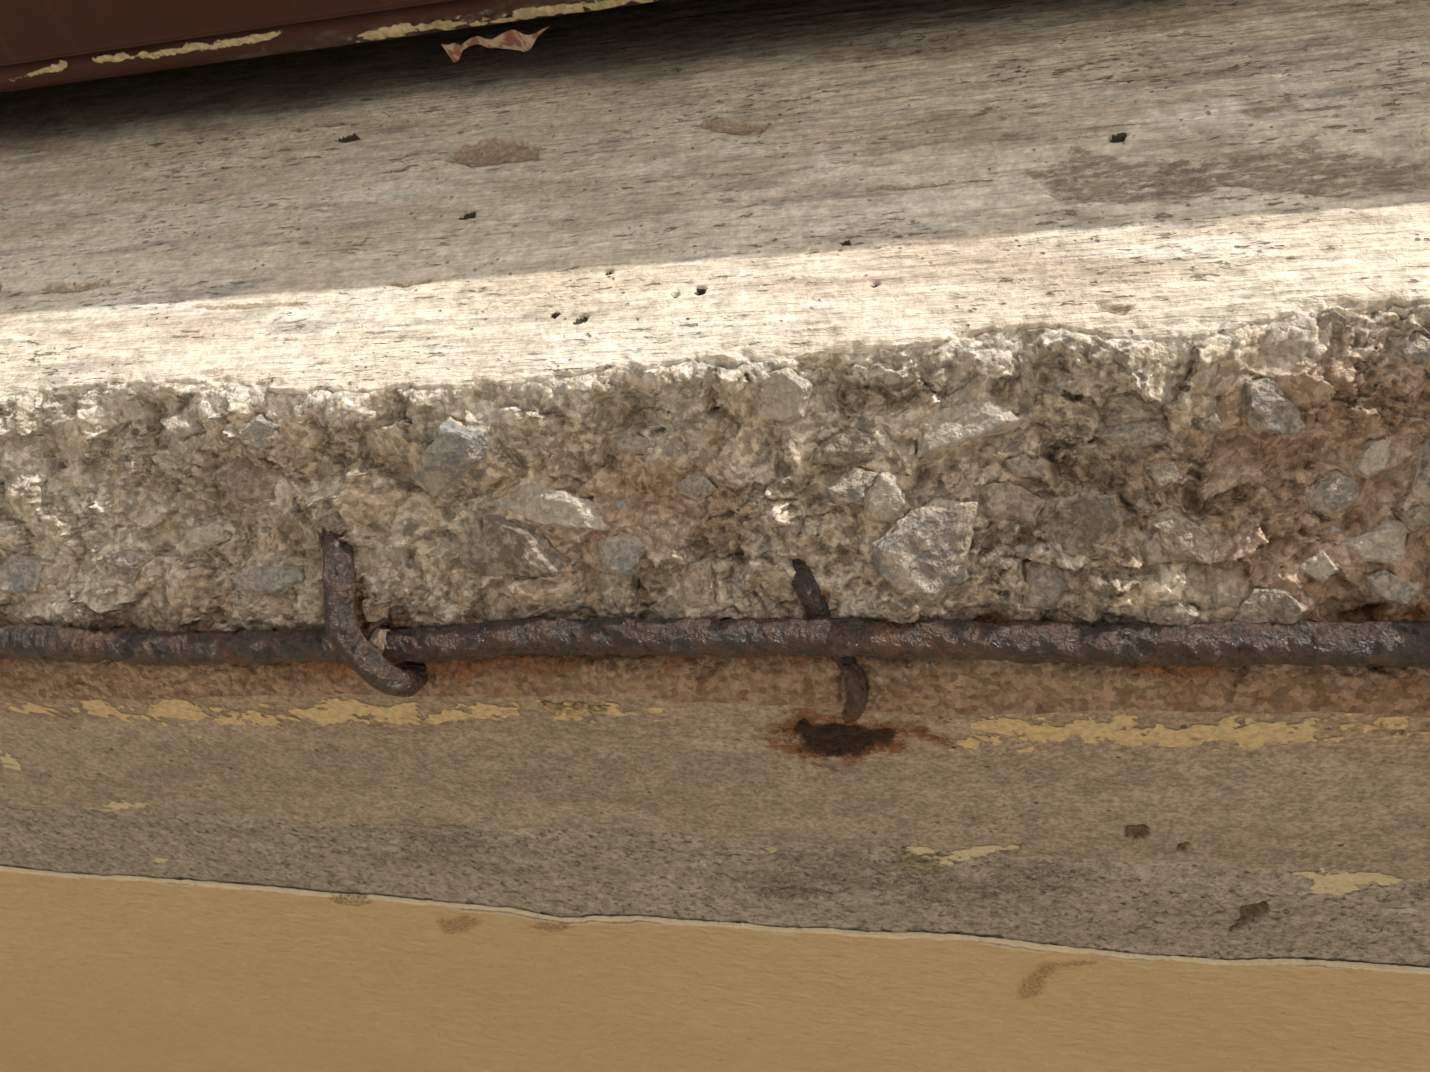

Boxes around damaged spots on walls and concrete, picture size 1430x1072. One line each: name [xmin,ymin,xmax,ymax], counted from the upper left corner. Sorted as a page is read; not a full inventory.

peeling [441,26,549,62]
spalling [336,133,360,143]
peeling [452,139,541,167]
spalling [1030,133,1430,204]
spalling [0,302,1430,666]
corrosion [354,574,407,630]
corrosion [1301,603,1430,622]
spalling [0,658,387,700]
spalling [412,653,847,710]
spalling [855,657,1430,717]
corrosion [760,708,953,772]
spalling [1126,824,1149,840]